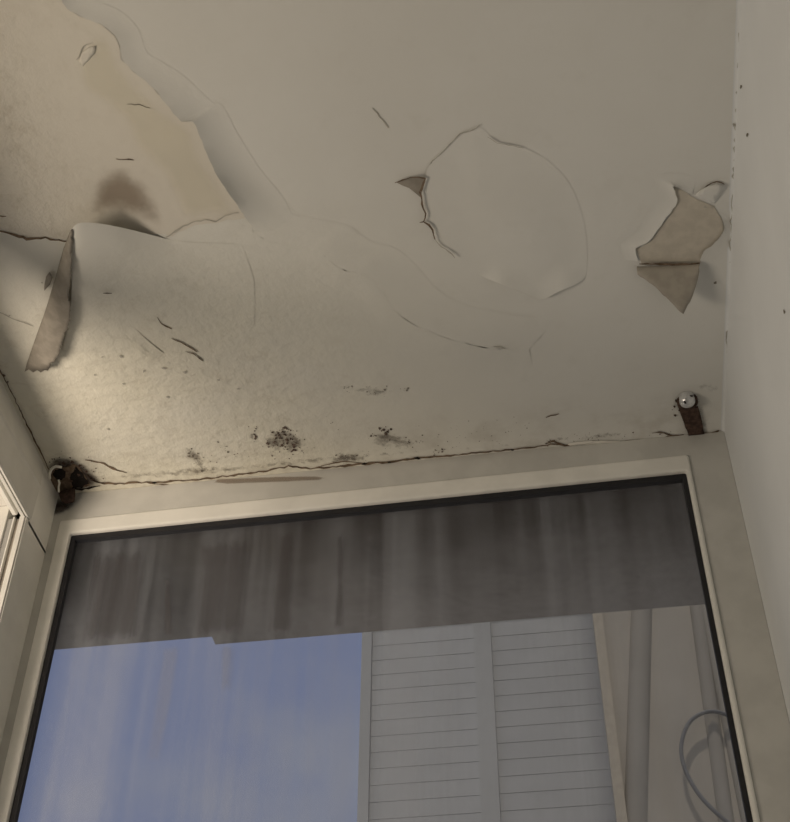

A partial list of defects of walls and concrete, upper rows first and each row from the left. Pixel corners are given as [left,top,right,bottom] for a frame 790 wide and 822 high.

crack [0,216,66,242]
peeling [0,0,292,390]
peeling [620,173,733,314]
mould [266,426,305,459]